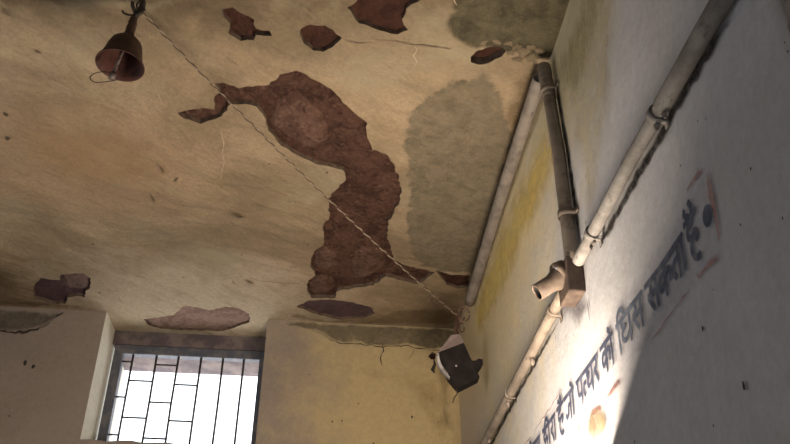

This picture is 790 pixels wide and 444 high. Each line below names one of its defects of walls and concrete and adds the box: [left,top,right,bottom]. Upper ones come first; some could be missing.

spalling [222,7,272,41]
spalling [300,24,341,52]
spalling [347,0,420,34]
crack [348,40,448,66]
spalling [471,40,545,65]
damp [448,0,569,59]
damp [405,75,524,273]
spalling [178,71,470,373]
spalling [33,273,100,304]
crack [0,312,64,334]
rust [587,412,605,443]